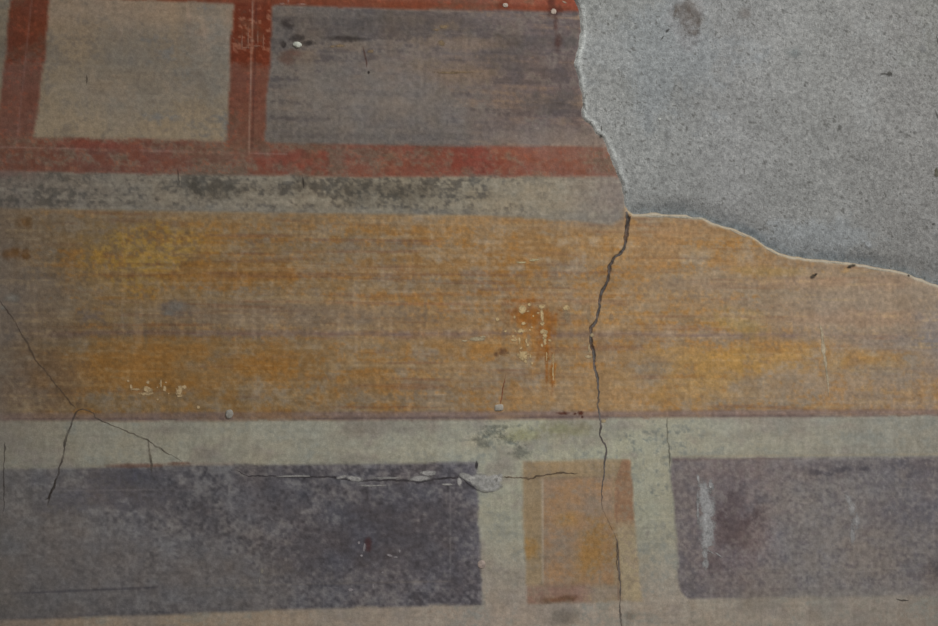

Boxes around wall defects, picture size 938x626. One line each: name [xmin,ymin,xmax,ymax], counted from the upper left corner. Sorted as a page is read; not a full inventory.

flaking render [563,0,938,285]
crack [585,212,631,508]
crack [47,409,171,502]
crack [240,472,473,487]
crack [506,472,577,480]
crack [614,533,622,626]